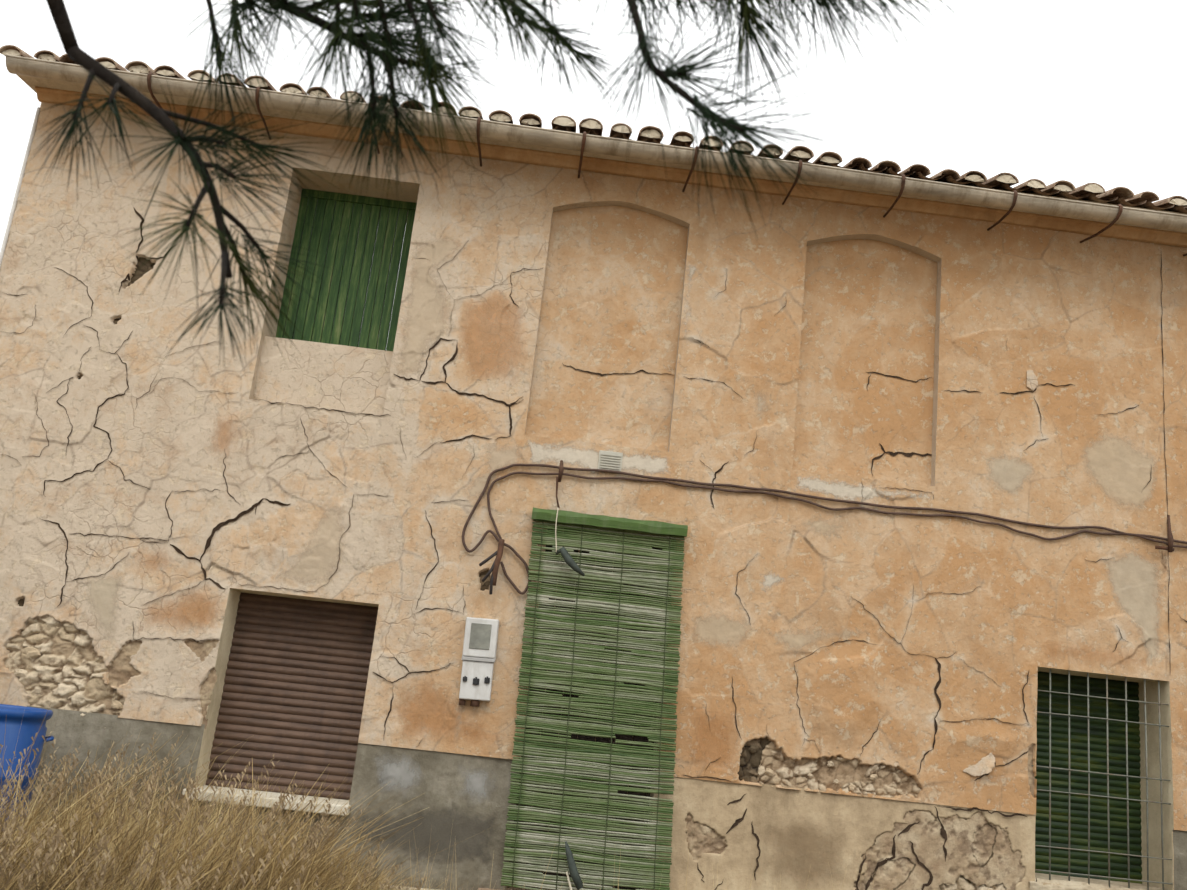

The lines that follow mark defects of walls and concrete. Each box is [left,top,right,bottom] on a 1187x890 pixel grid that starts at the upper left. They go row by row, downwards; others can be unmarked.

spalling [125,257,156,288]
crack [119,208,174,291]
crack [562,363,740,396]
crack [2,240,542,642]
spalling [4,615,142,728]
crack [373,656,448,734]
crack [794,585,1029,890]
spalling [737,737,1025,890]